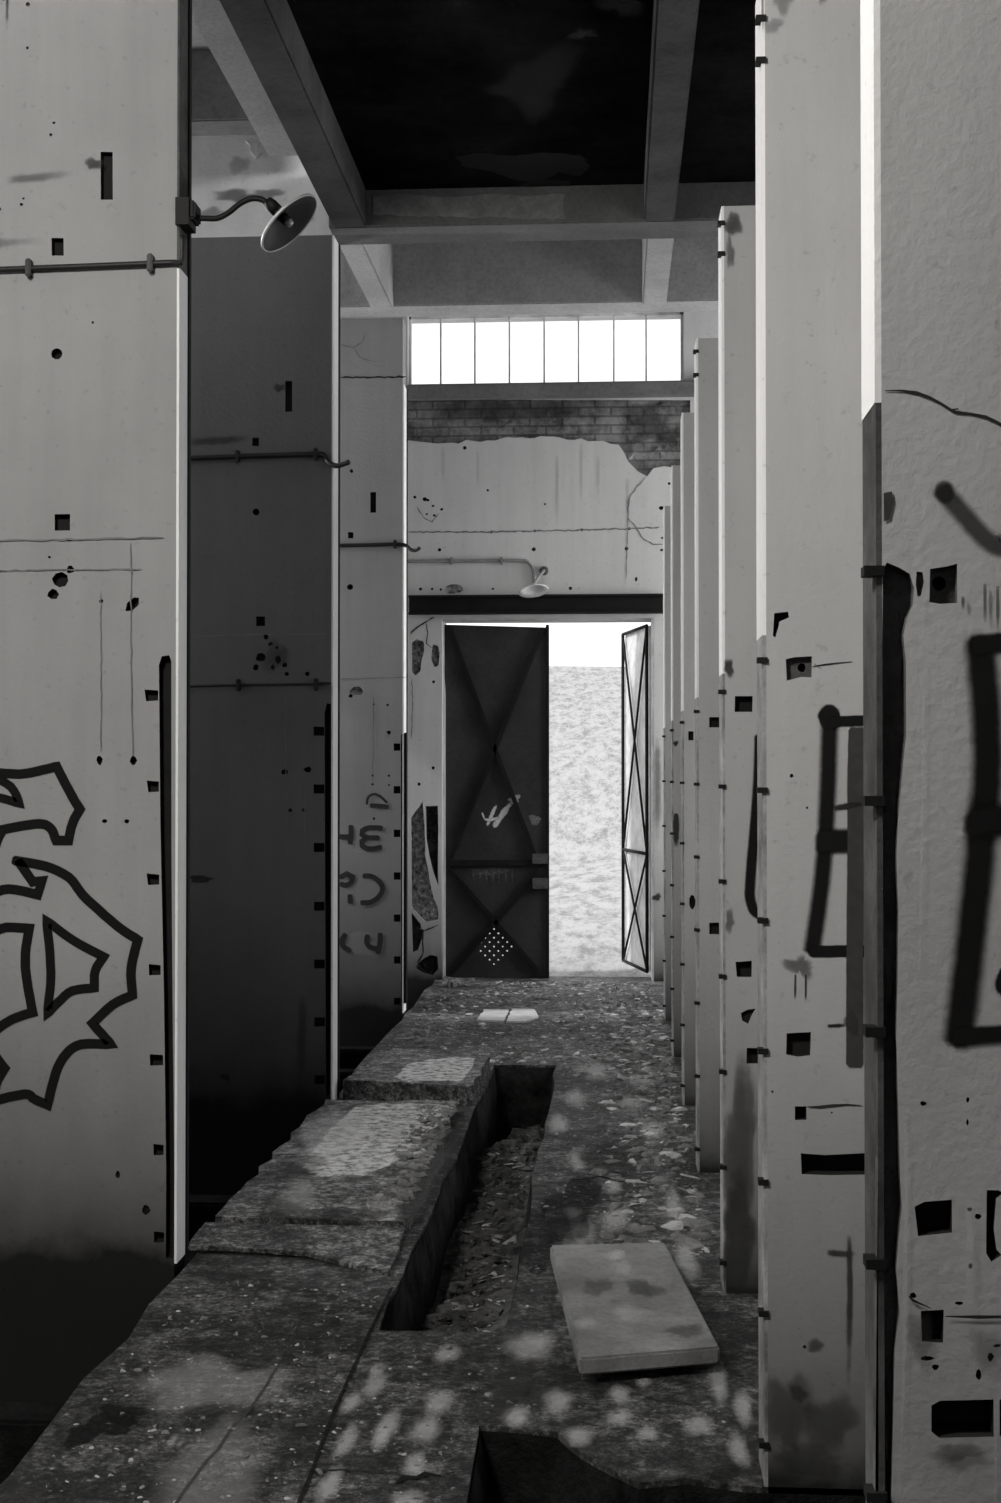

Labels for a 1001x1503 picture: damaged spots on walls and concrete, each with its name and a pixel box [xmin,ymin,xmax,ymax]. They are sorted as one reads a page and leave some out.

flaking render [408,400,690,485]
crack [885,390,1001,426]